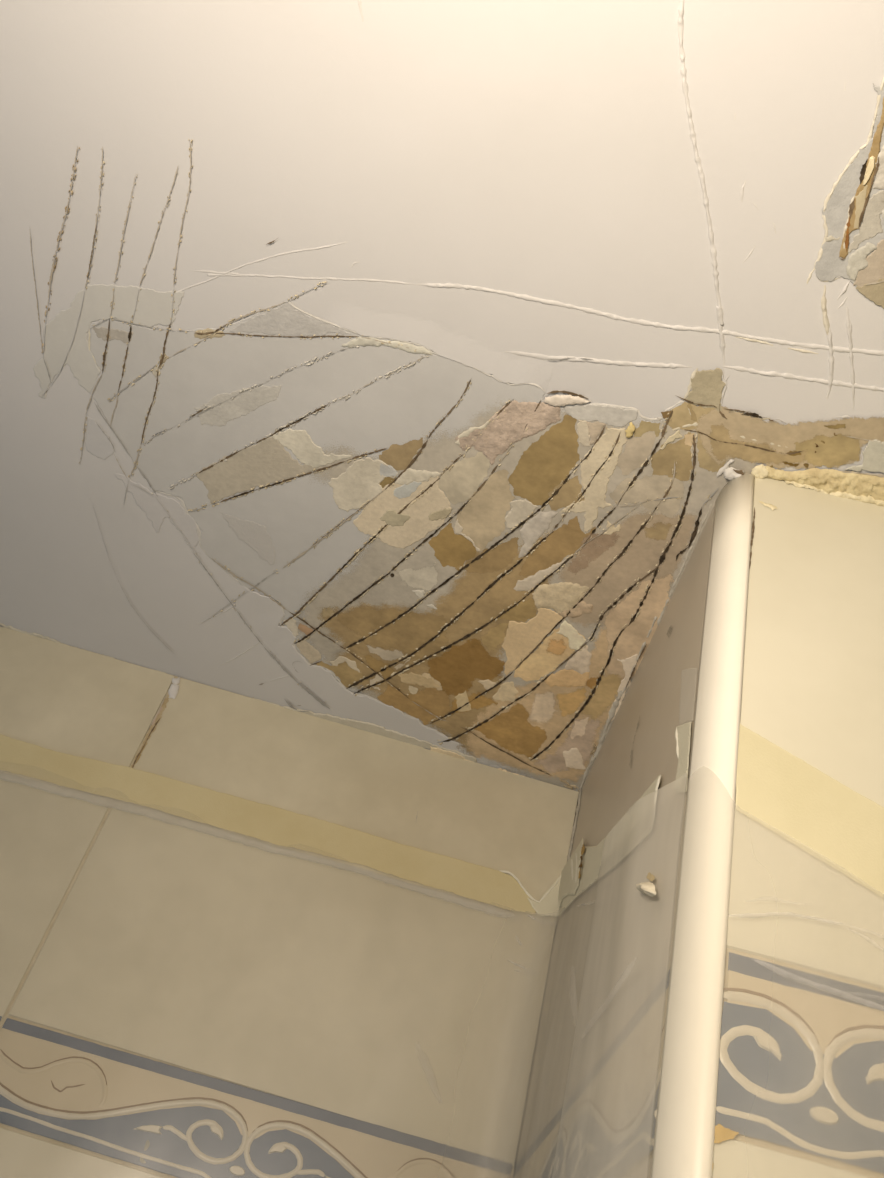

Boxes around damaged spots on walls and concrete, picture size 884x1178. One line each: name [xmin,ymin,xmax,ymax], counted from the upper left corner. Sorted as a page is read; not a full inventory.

peeling [814,77,884,309]
peeling [33,284,758,792]
crack [29,139,802,776]